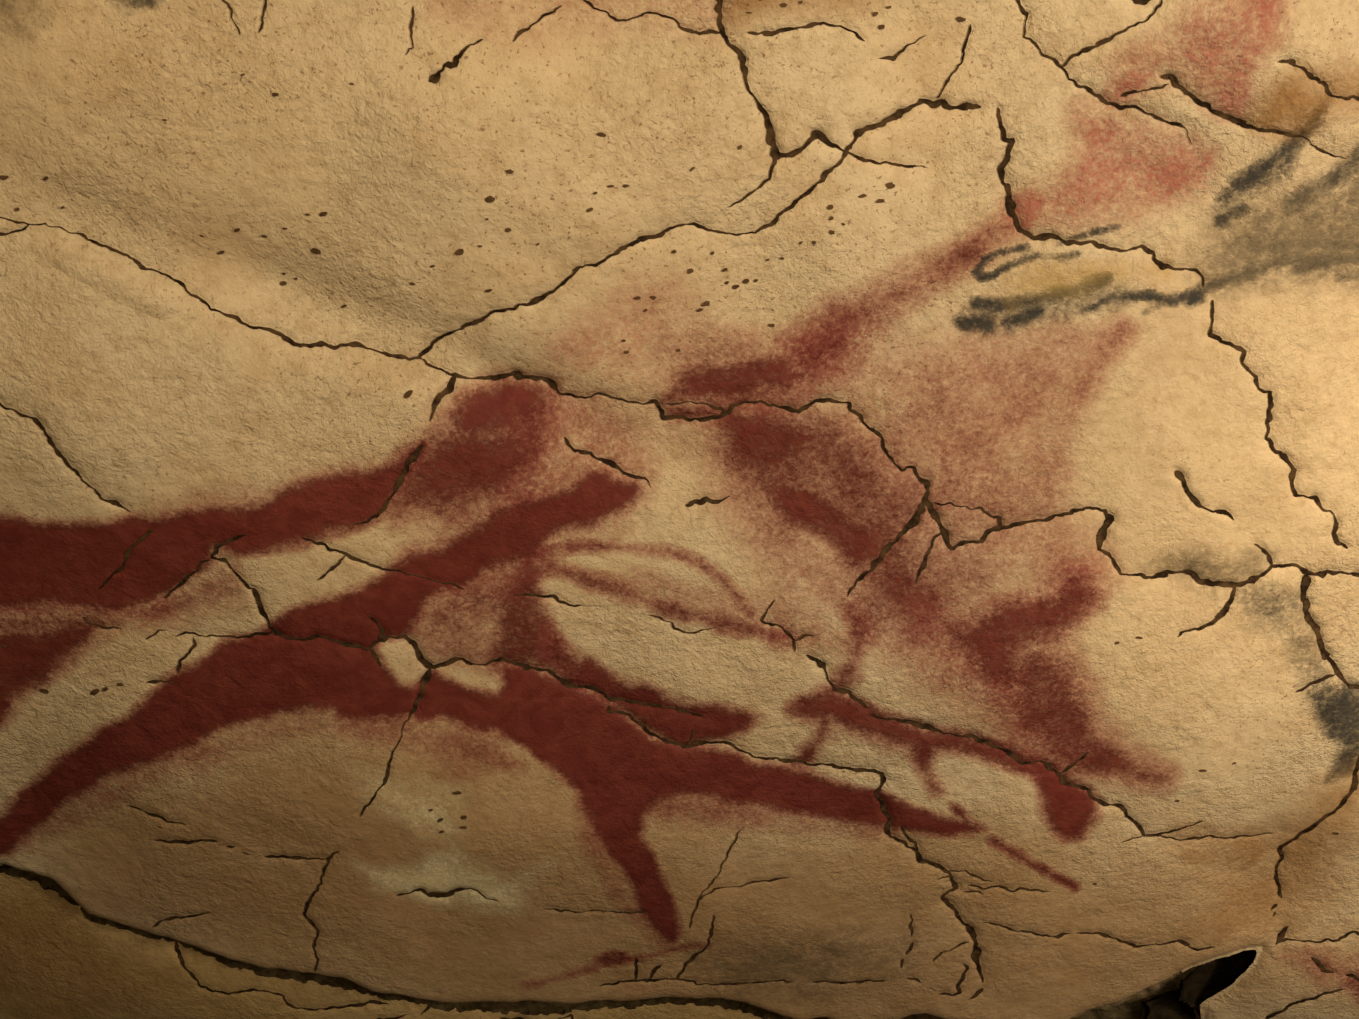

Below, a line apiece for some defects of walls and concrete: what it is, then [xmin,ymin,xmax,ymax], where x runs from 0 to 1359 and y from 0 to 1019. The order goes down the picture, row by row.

crack [0,0,1359,692]
crack [153,912,433,1019]
crack [0,403,1213,1000]
crack [761,600,1359,1019]
spalling [1179,950,1257,1009]